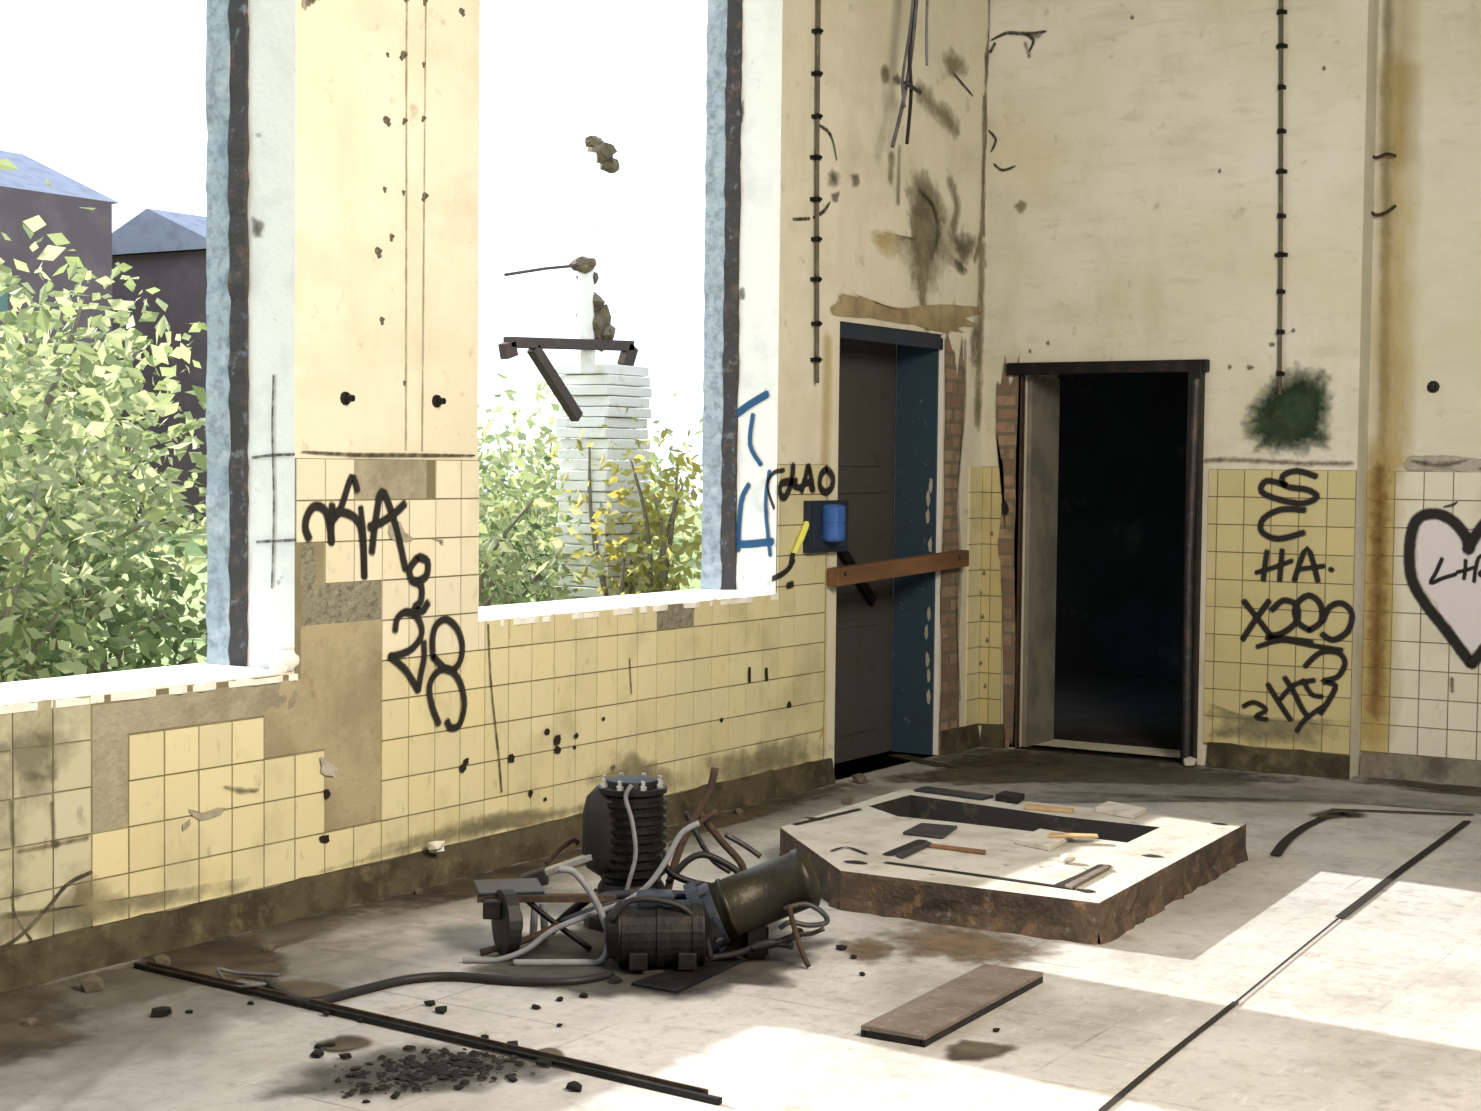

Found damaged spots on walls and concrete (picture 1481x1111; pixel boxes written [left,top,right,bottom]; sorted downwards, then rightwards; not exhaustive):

water stain [882,67,959,134]
flaking render [988,130,1015,172]
flaking render [252,218,262,236]
water stain [879,152,974,306]
water stain [972,324,980,356]
peeling [92,375,381,843]